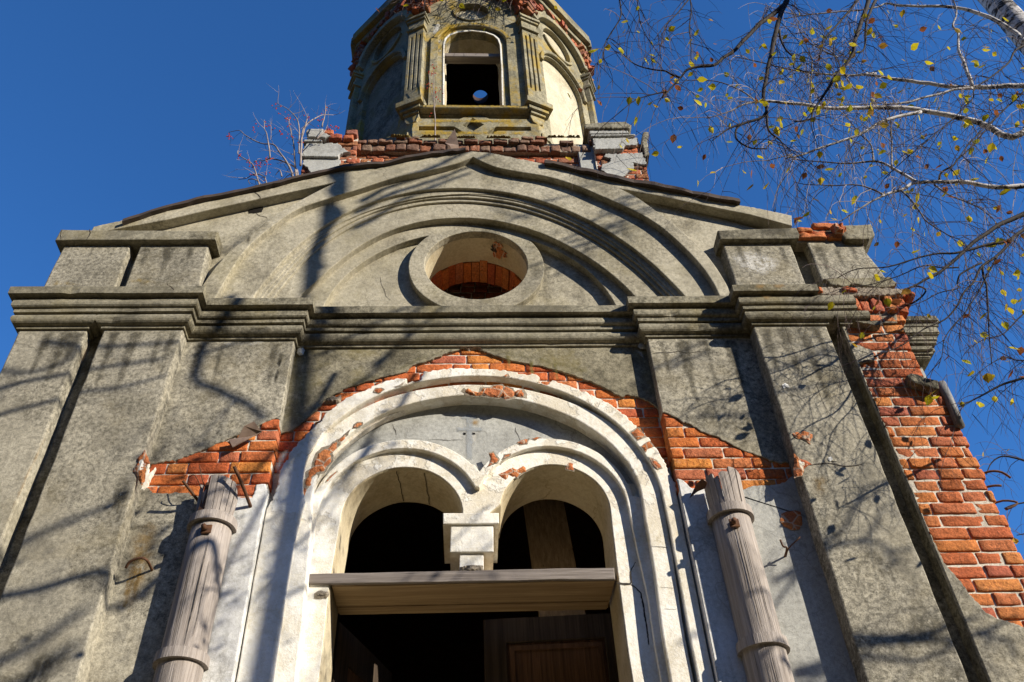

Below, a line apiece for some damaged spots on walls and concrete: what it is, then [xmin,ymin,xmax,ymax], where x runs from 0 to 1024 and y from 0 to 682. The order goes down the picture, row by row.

flaking render [796,223,842,241]
flaking render [133,347,813,502]
flaking render [780,510,802,530]
flaking render [818,286,1024,627]